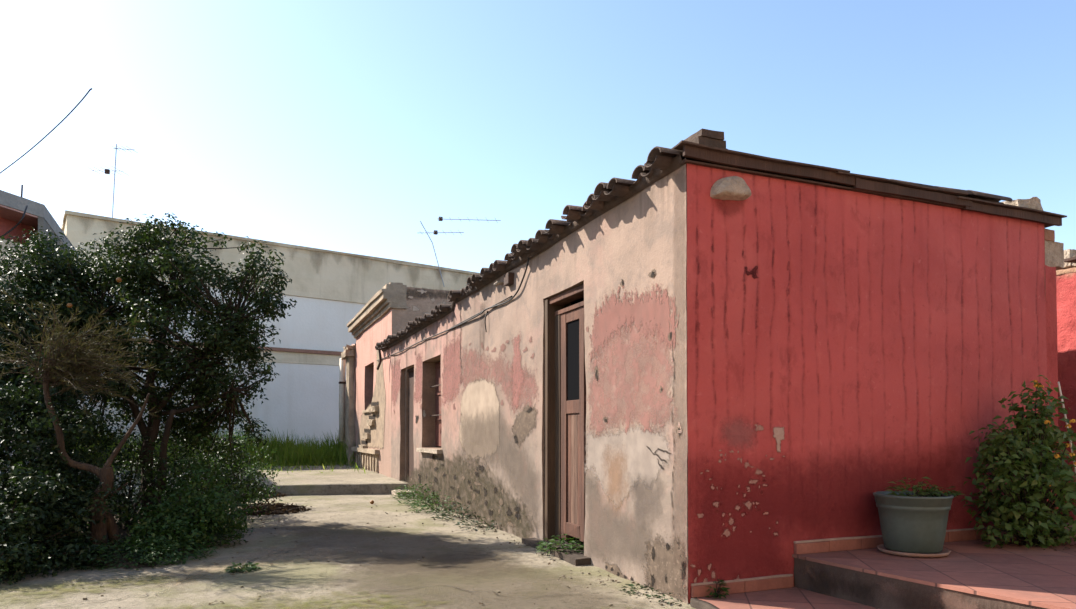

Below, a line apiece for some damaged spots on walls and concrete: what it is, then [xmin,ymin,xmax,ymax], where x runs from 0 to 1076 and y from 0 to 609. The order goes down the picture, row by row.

peeling [440,334,538,447]
crack [646,439,675,500]
peeling [700,450,778,537]